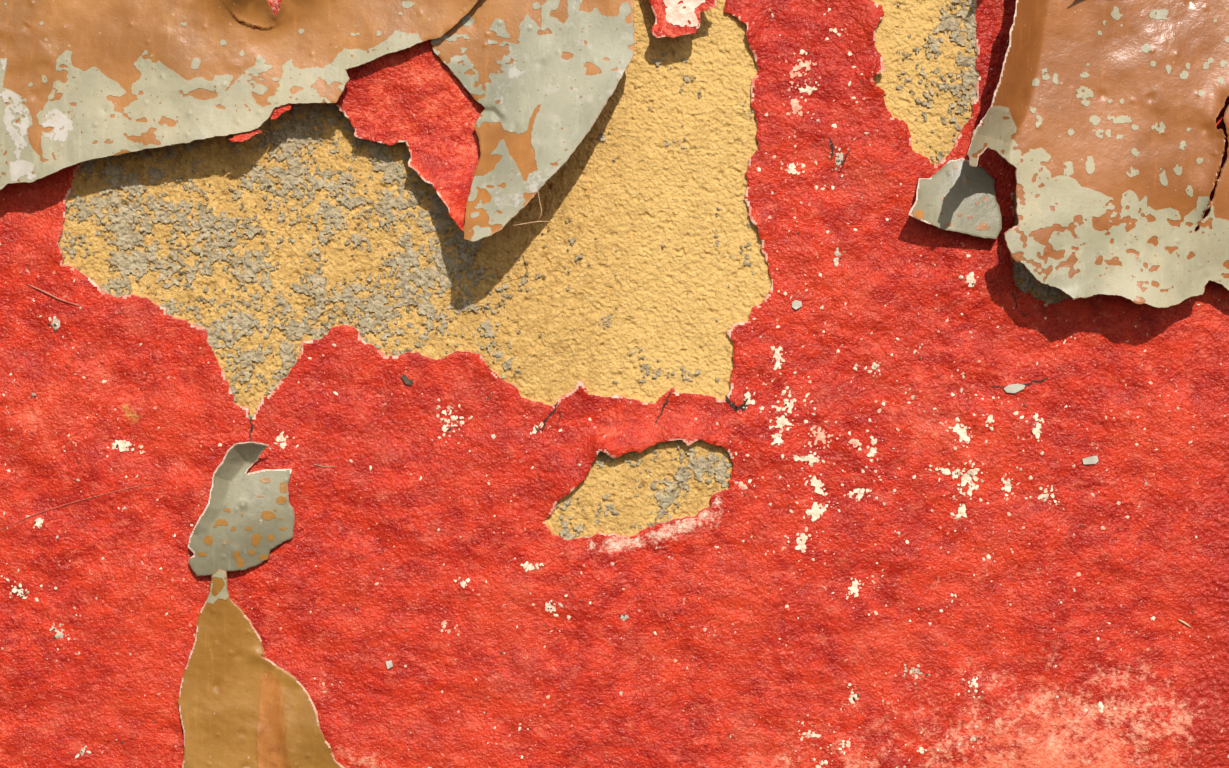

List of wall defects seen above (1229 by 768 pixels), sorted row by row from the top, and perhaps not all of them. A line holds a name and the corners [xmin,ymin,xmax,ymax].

spalling [783,49,819,121]
spalling [780,161,805,175]
spalling [815,138,855,190]
peeling [872,0,1229,308]
spalling [0,0,772,420]
spalling [760,336,786,370]
spalling [106,440,145,454]
spalling [426,405,473,452]
spalling [545,440,747,540]
spalling [743,384,895,562]
peeling [178,430,345,768]